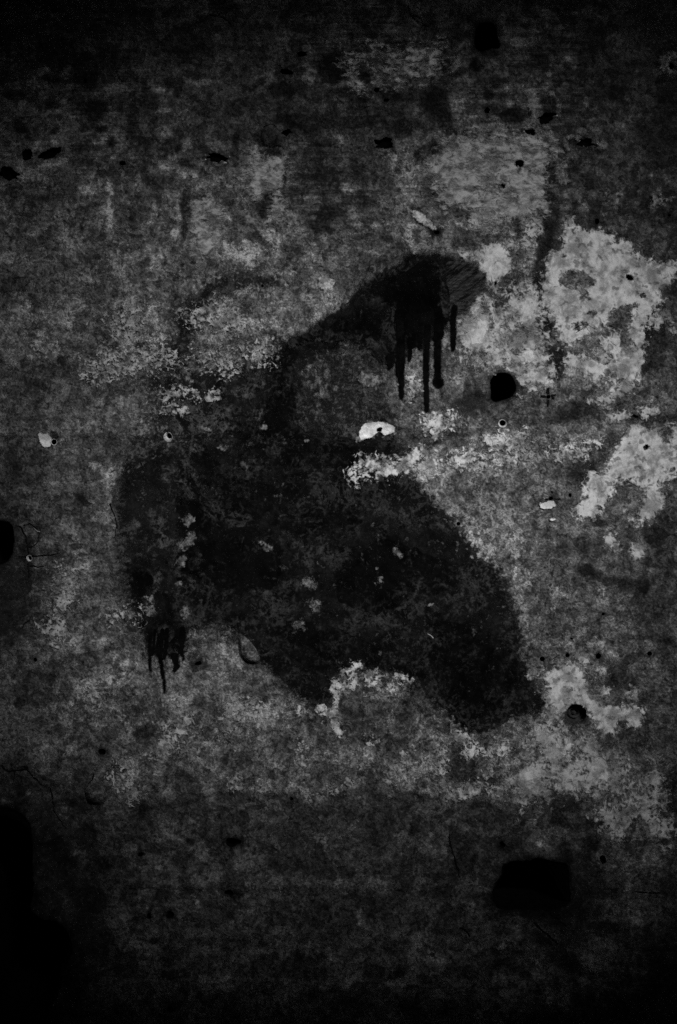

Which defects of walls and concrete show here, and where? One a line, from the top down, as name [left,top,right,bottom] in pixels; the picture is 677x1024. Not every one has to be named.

water stain [35,558,86,648]
water stain [79,253,604,807]